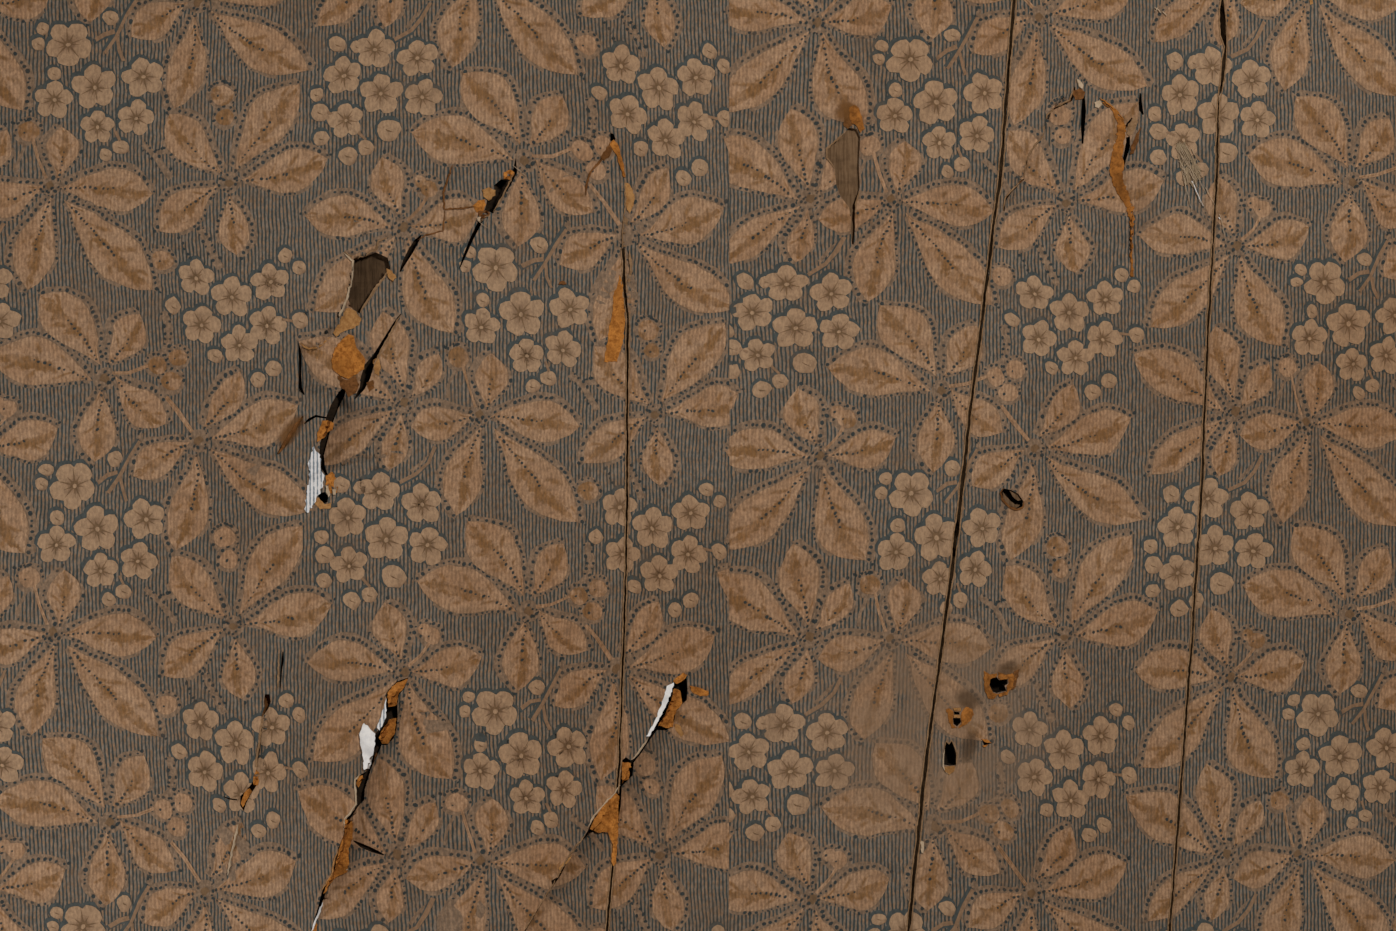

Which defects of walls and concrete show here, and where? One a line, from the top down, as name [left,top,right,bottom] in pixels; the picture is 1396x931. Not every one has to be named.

spalling [1037,87,1086,144]
spalling [1123,93,1144,166]
spalling [459,159,517,269]
spalling [828,128,860,244]
spalling [348,235,422,313]
spalling [300,314,401,475]
crack [276,652,284,690]
spalling [983,669,1019,699]
spalling [616,678,687,820]
spalling [943,707,974,775]
spalling [311,678,408,930]